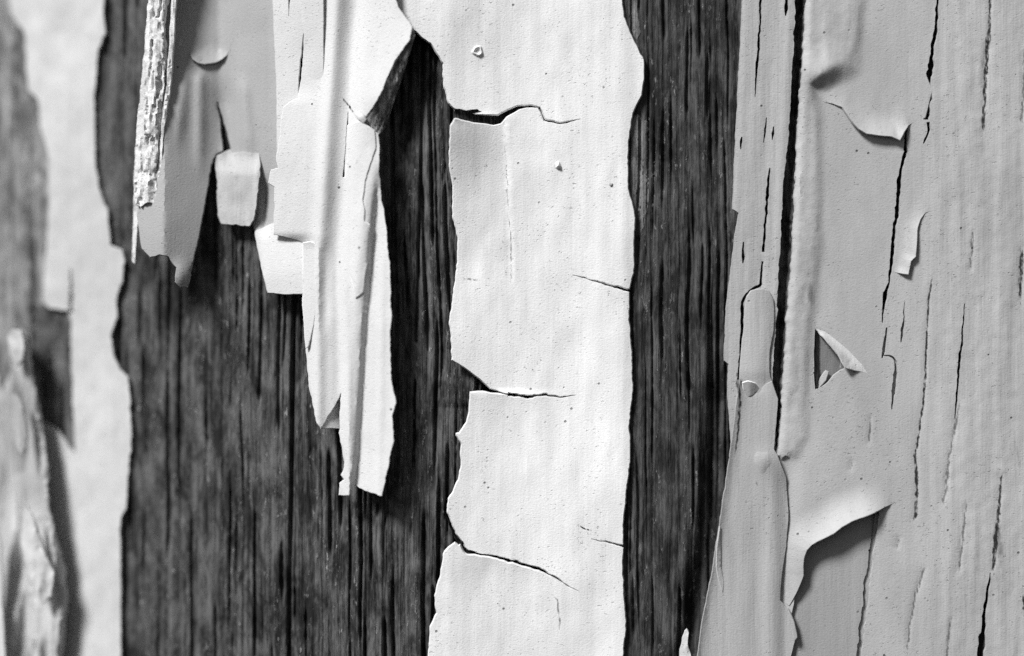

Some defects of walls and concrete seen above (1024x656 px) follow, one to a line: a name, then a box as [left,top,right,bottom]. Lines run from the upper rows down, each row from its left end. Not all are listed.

crack [453,106,568,125]
crack [882,0,938,308]
spalling [95,0,484,656]
crack [490,390,557,398]
spalling [603,0,904,656]
crack [446,516,568,586]
crack [977,475,1002,656]